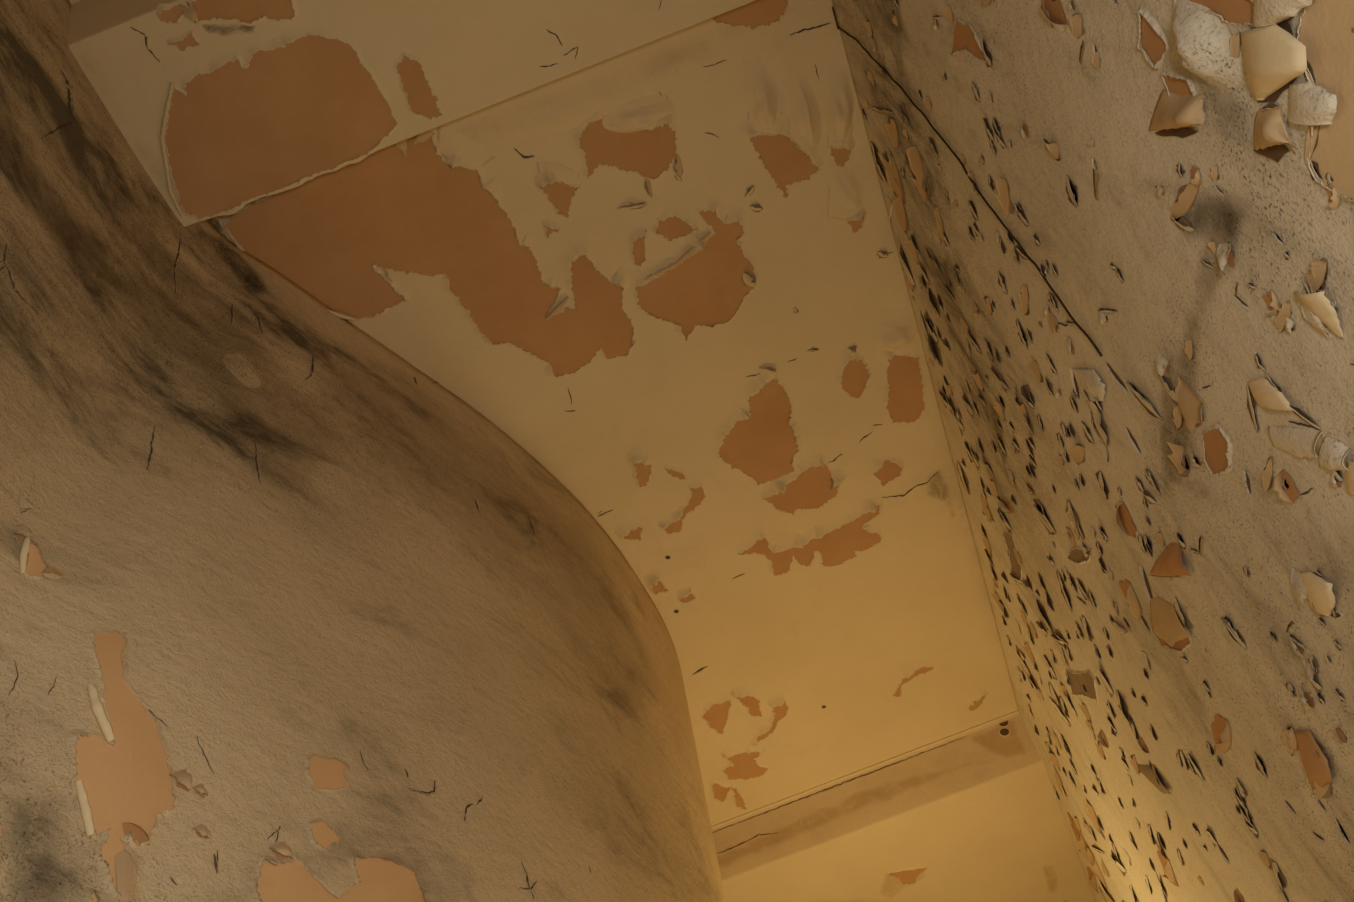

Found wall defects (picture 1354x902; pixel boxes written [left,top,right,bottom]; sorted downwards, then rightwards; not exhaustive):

peeling [709,0,790,30]
peeling [931,5,994,68]
peeling [1040,0,1101,71]
peeling [1137,6,1207,138]
peeling [1173,0,1354,209]
peeling [156,0,763,379]
peeling [614,447,706,541]
peeling [712,367,847,515]
peeling [736,69,1354,902]
peeling [65,629,208,902]
peeling [700,686,789,810]
peeling [246,818,431,902]